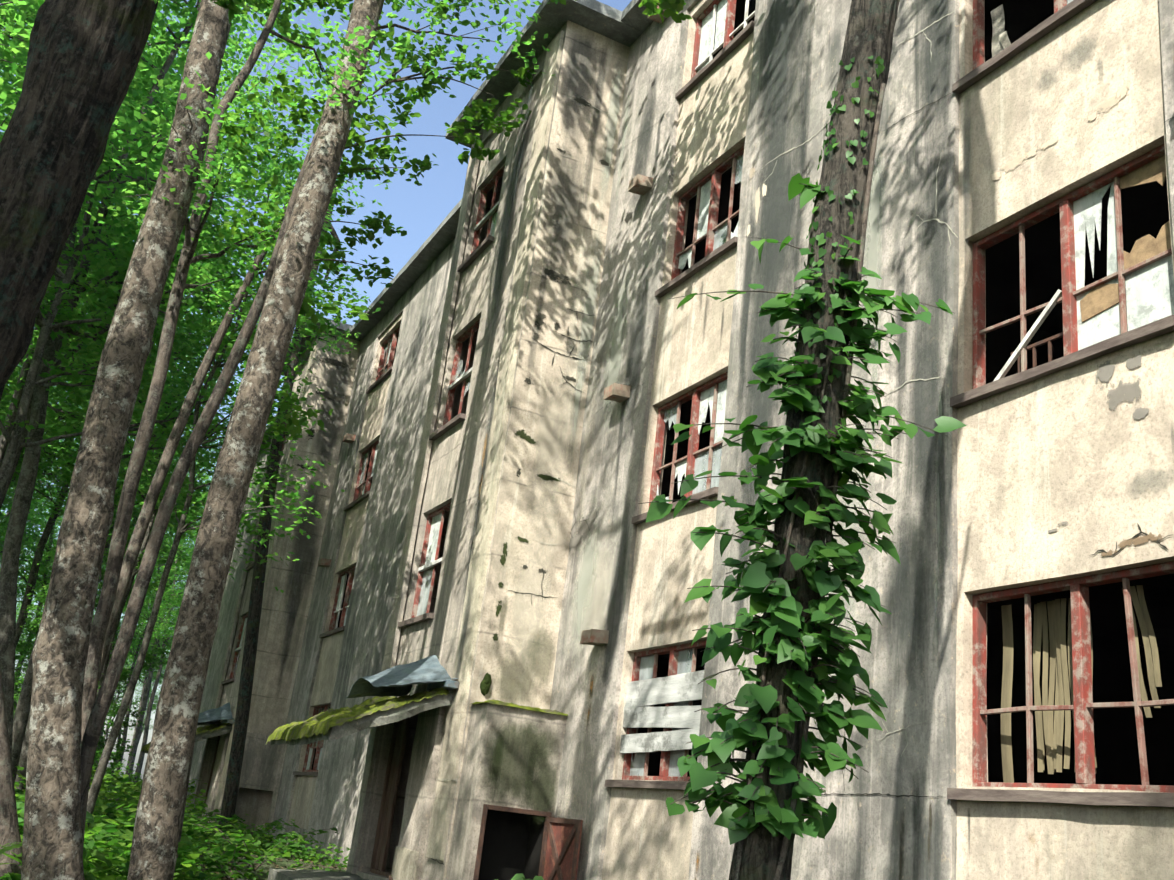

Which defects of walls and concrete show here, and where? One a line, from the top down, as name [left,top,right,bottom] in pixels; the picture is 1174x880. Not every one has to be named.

water stain [566,41,620,178]
water stain [921,0,949,121]
water stain [553,159,578,254]
water stain [574,258,599,432]
water stain [897,145,947,552]
peeling [1095,355,1149,420]
water stain [890,531,922,663]
crack [1092,523,1171,556]
water stain [919,804,940,880]